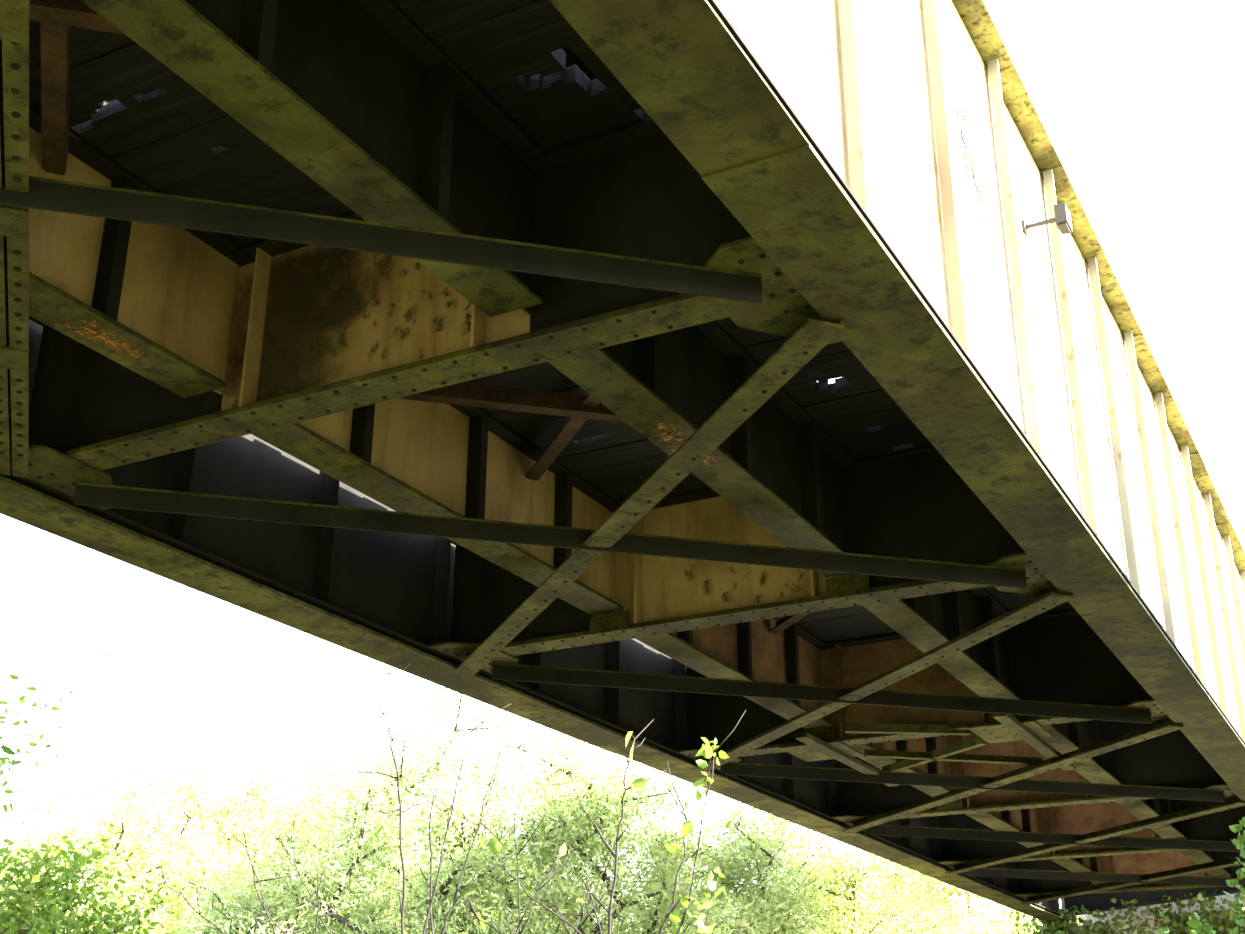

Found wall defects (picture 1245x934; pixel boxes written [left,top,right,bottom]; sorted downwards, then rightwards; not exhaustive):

rust [899,0,941,285]
rust [54,318,141,360]
leakage [339,254,452,357]